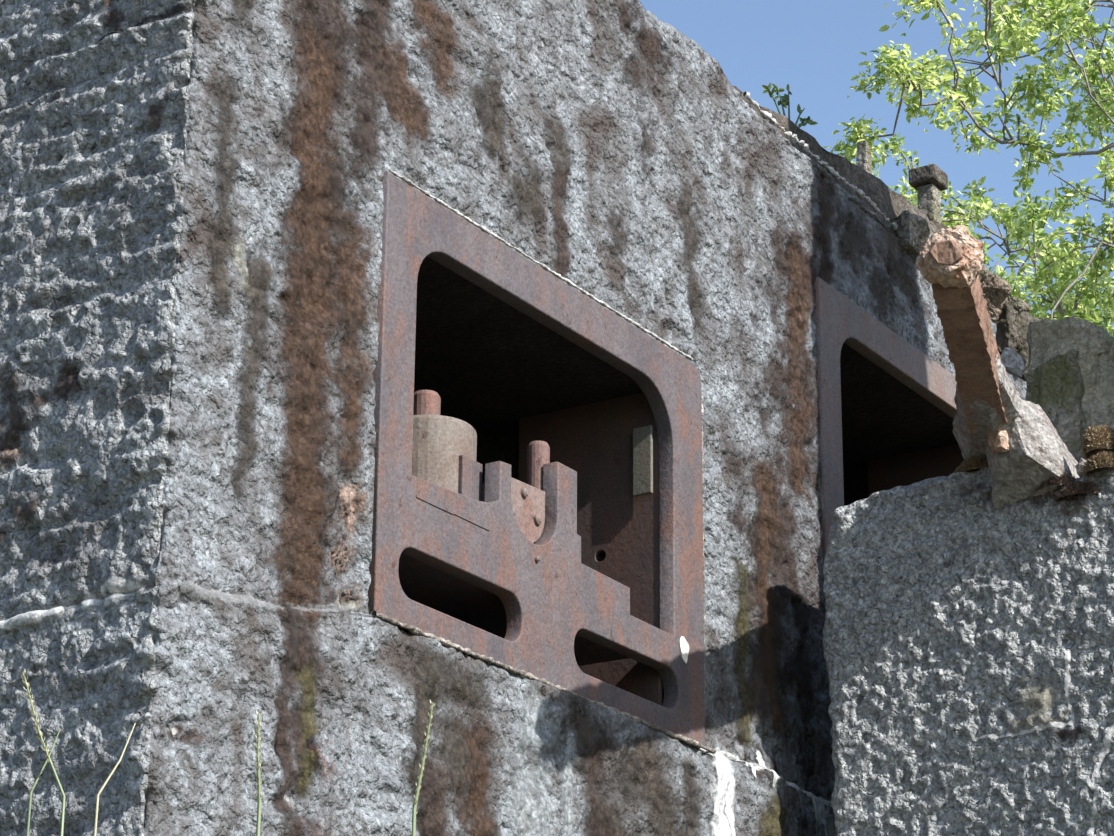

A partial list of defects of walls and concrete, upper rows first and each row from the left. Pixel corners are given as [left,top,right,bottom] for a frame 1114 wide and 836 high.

corrosion [412,0,457,98]
water stain [473,64,505,157]
water stain [211,76,239,312]
water stain [510,115,570,280]
water stain [681,184,703,329]
water stain [233,258,272,496]
corrosion [271,0,430,836]
crack [0,580,144,629]
water stain [403,647,501,836]
water stain [514,699,735,836]
crack [972,651,1075,741]
crack [1087,727,1114,836]